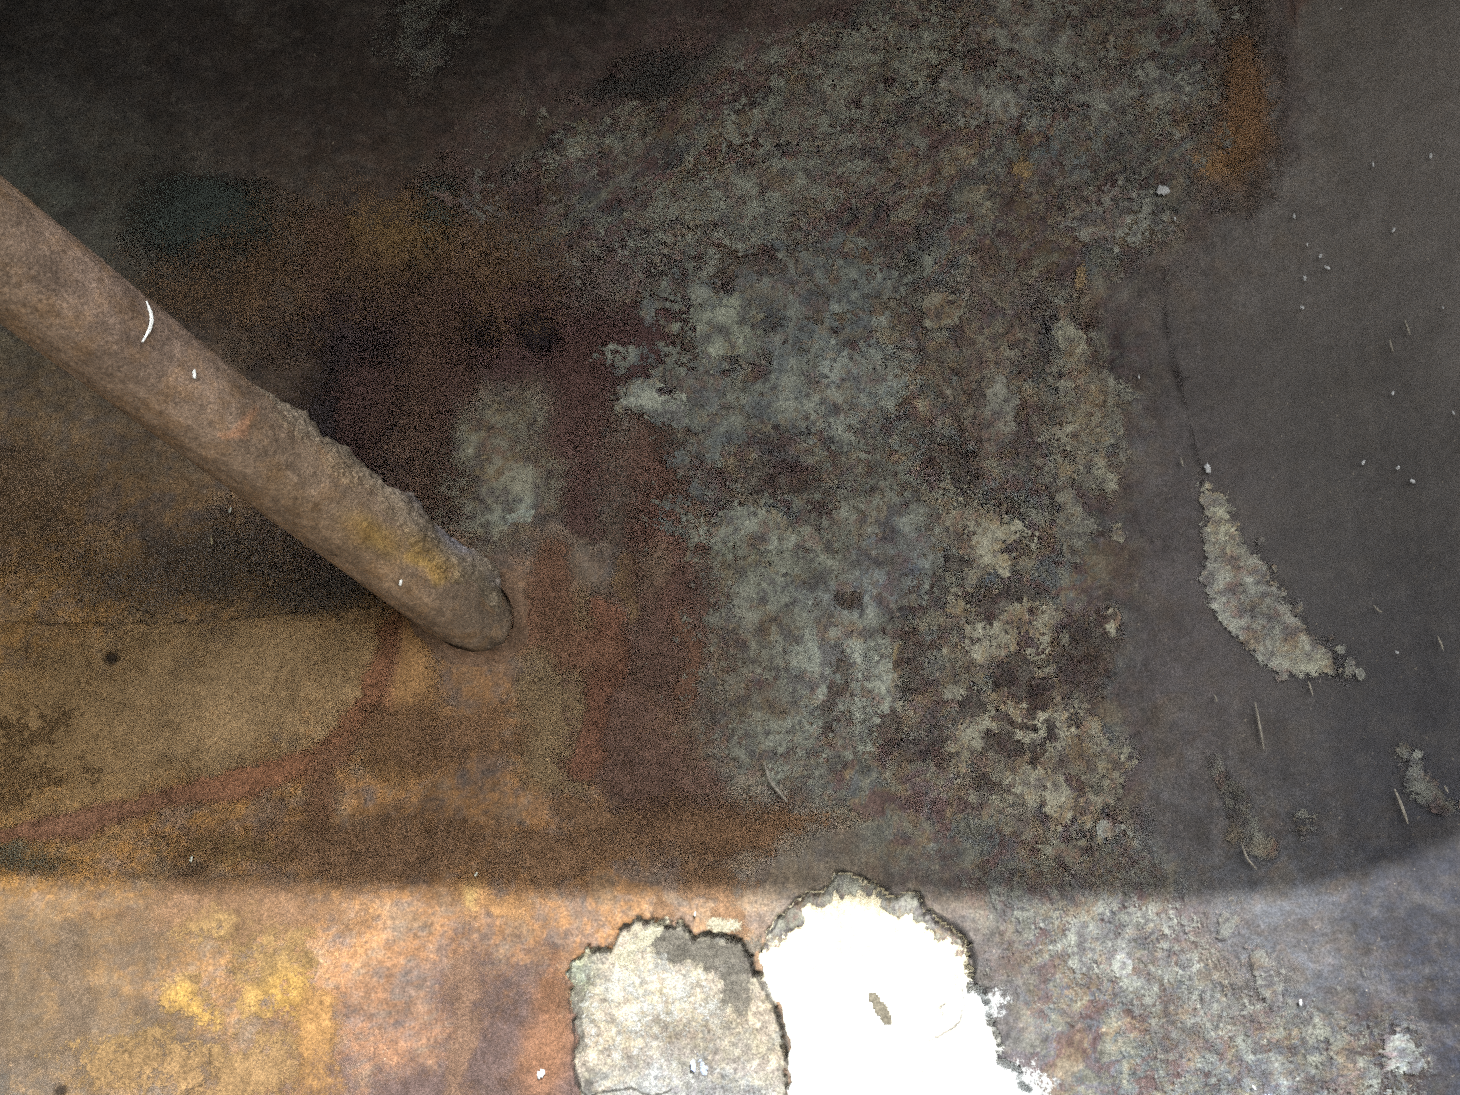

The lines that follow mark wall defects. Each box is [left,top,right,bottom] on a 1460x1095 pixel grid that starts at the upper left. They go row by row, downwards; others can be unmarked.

rust [1183,0,1288,218]
rust [0,410,830,1095]
peeling [418,0,1433,1095]